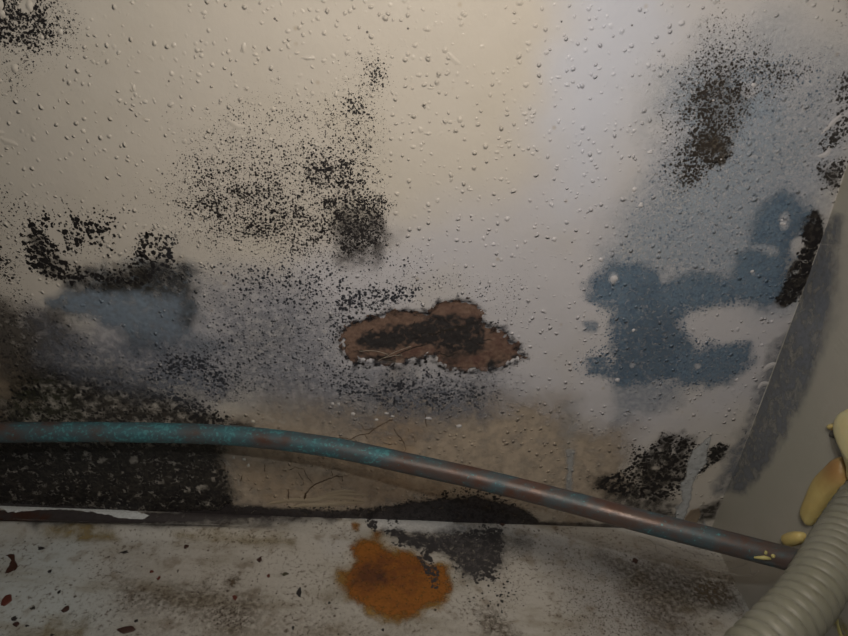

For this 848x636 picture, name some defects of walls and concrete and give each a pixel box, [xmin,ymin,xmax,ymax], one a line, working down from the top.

damp [0,0,88,96]
damp [0,46,700,518]
damp [573,7,848,521]
peeling [338,297,528,379]
spalling [5,554,18,573]
damp [0,442,621,621]
rust [336,533,452,622]